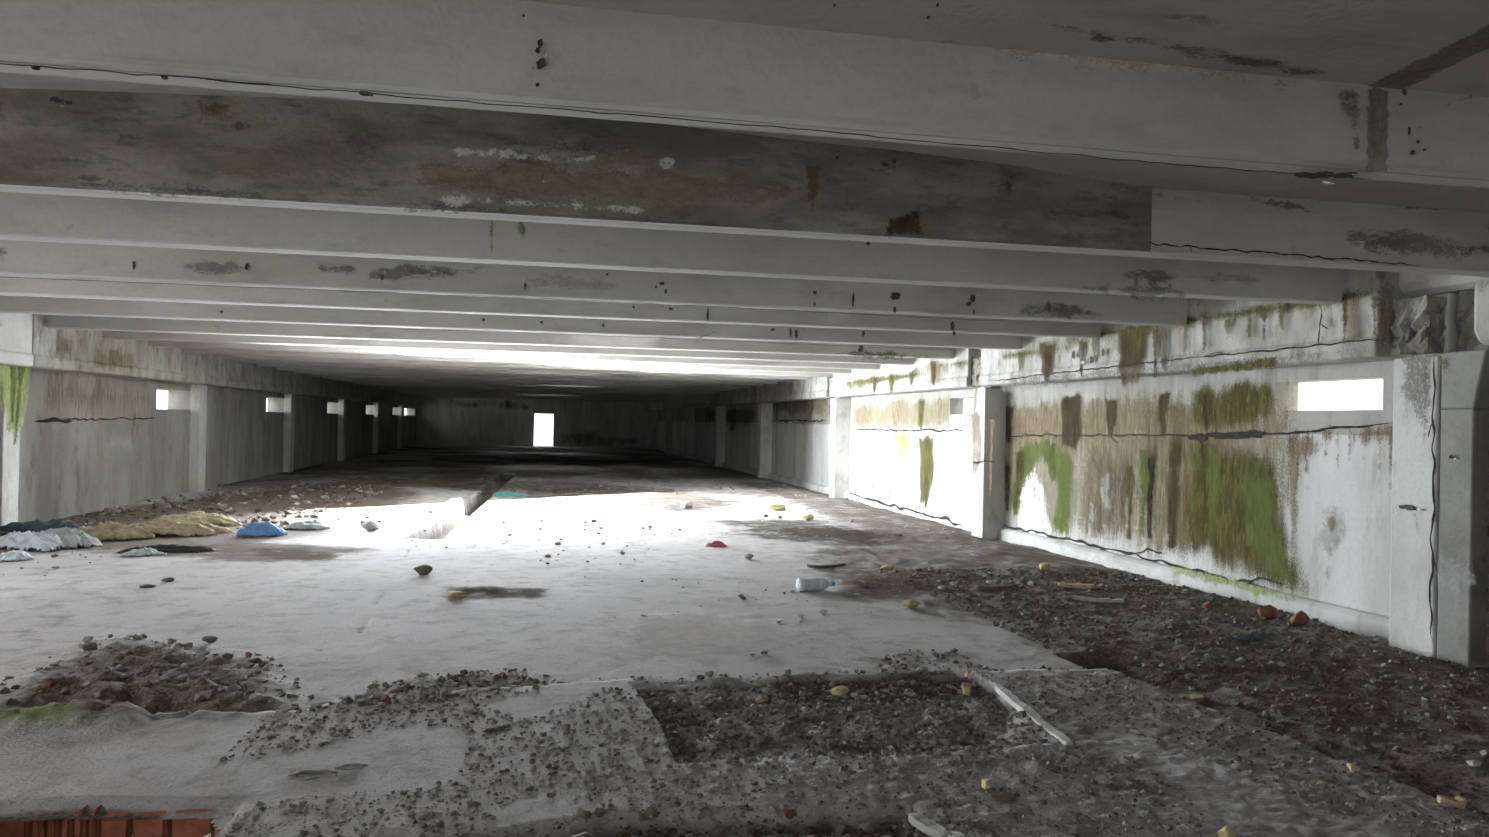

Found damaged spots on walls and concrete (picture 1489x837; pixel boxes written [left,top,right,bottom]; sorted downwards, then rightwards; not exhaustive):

leakage [1348,229,1489,258]
leakage [1002,308,1319,586]
crack [1428,361,1437,642]